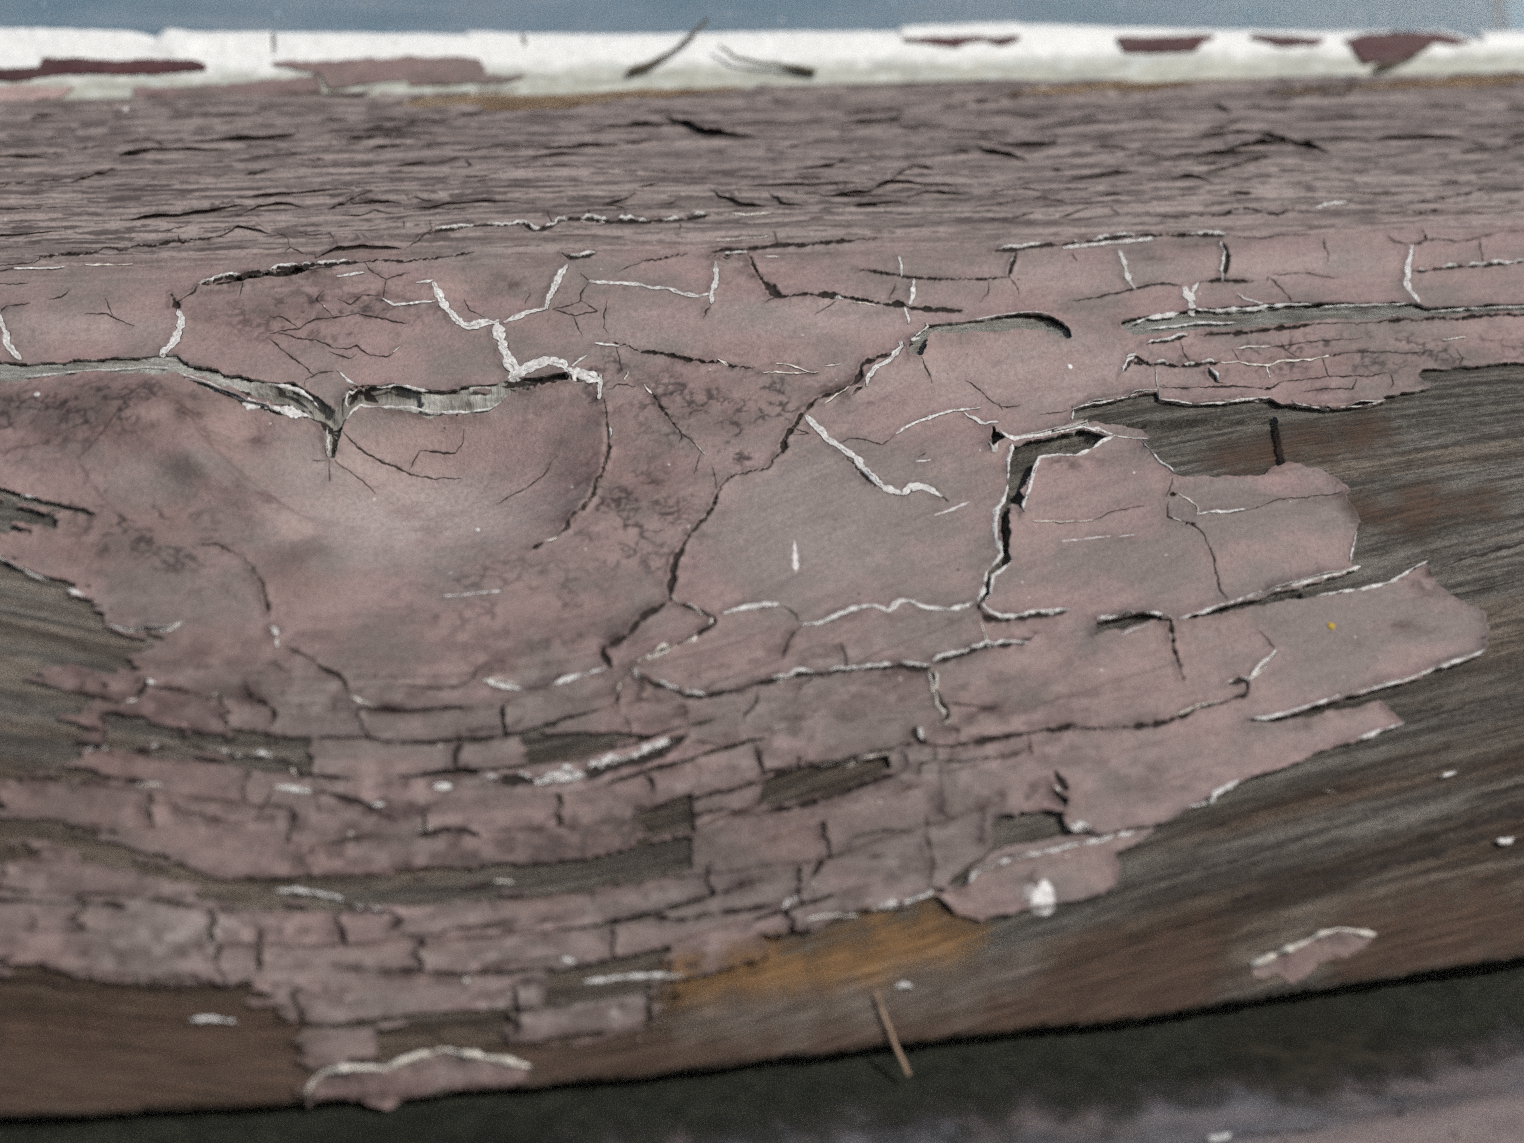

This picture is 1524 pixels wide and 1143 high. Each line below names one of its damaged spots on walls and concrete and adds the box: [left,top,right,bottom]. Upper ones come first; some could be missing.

peeling [903,35,1021,48]
peeling [1117,34,1215,54]
peeling [1250,34,1325,48]
peeling [1344,31,1472,65]
crack [0,138,204,210]
peeling [1276,303,1524,325]
crack [73,96,1524,837]
peeling [0,364,1524,1116]
crack [1115,805,1524,905]
crack [0,898,126,962]
crack [134,927,265,988]
crack [276,829,963,1040]